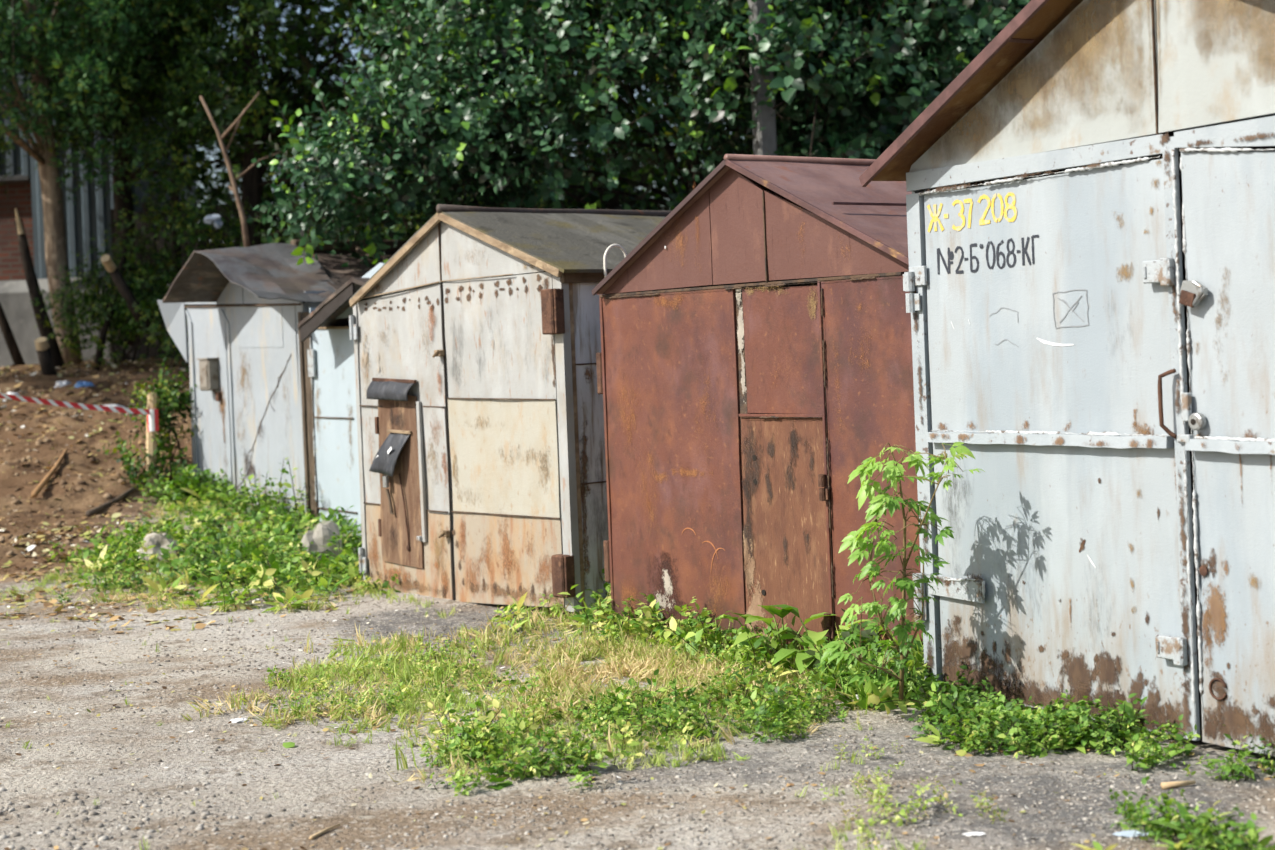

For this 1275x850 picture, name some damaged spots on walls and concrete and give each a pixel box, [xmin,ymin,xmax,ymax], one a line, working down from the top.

rust [1160,132,1170,175]
rust [1235,133,1274,141]
rust [364,265,549,340]
rust [917,362,975,440]
rust [1129,409,1153,448]
rust [1174,463,1216,578]
rust [369,523,557,603]
peeling [656,569,675,613]
rust [927,589,1275,749]